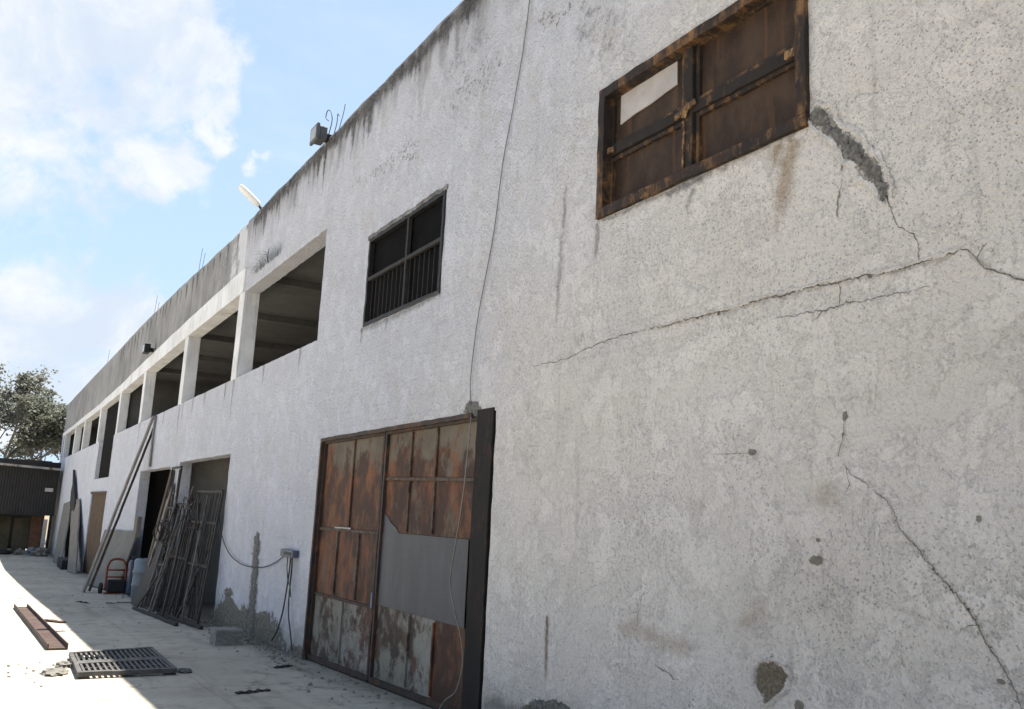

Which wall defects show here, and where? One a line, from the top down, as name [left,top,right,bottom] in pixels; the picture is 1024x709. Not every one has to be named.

water stain [120,0,476,360]
spalling [808,100,894,217]
crack [534,203,1024,367]
crack [838,411,1022,709]
spalling [750,655,804,709]